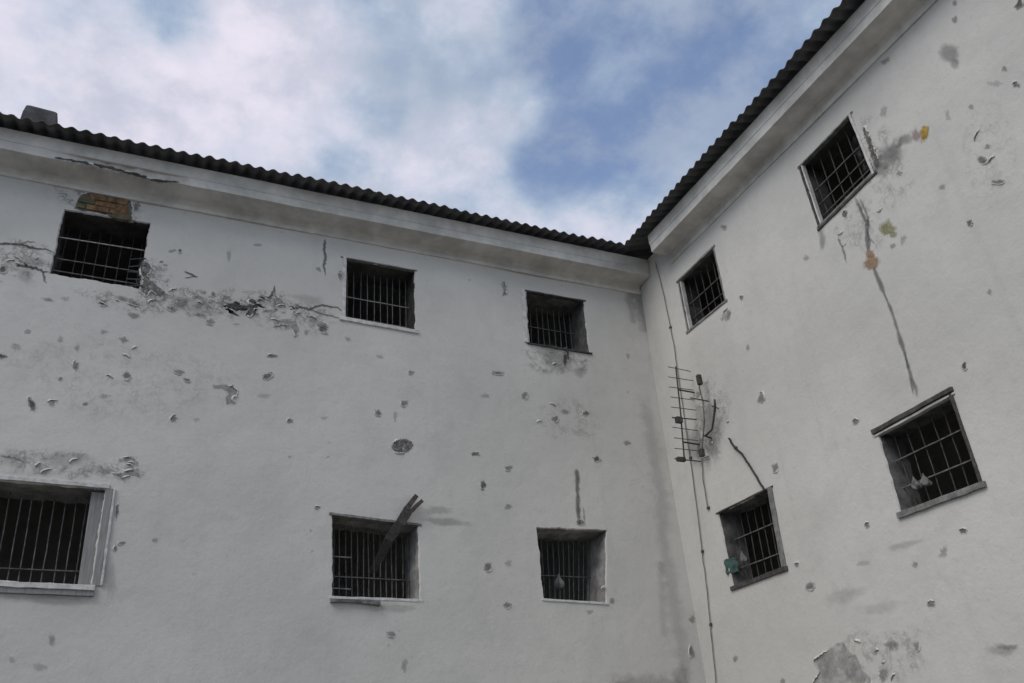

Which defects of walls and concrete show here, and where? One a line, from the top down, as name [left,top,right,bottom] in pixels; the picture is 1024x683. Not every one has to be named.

rust [913,126,929,140]
flaking render [60,190,141,223]
crack [0,241,55,273]
crack [321,240,329,275]
rust [865,251,878,269]
spalling [97,261,176,312]
peeling [231,297,328,338]
spalling [392,439,413,455]